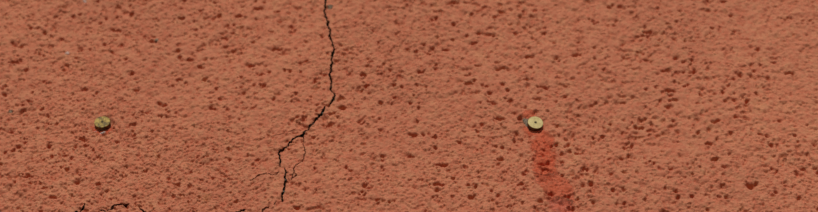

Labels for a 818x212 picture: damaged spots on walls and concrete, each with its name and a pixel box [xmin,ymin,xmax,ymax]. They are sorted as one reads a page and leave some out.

crack [236,0,336,212]
crack [75,204,145,212]
corrosion [523,110,574,212]